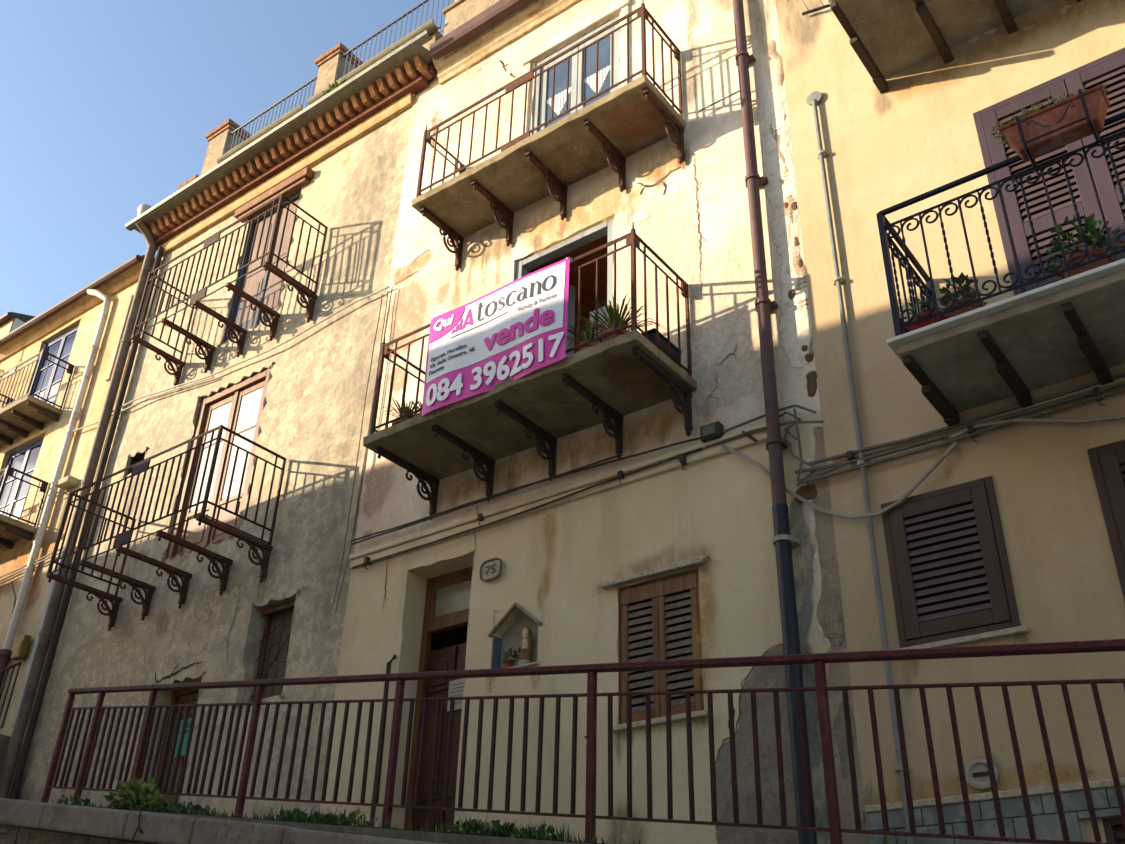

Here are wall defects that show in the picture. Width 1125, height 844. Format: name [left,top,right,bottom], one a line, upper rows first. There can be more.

leakage [685,59,696,101]
crack [637,154,708,296]
flaking render [633,40,817,411]
crack [152,594,240,685]
spalling [715,644,799,844]